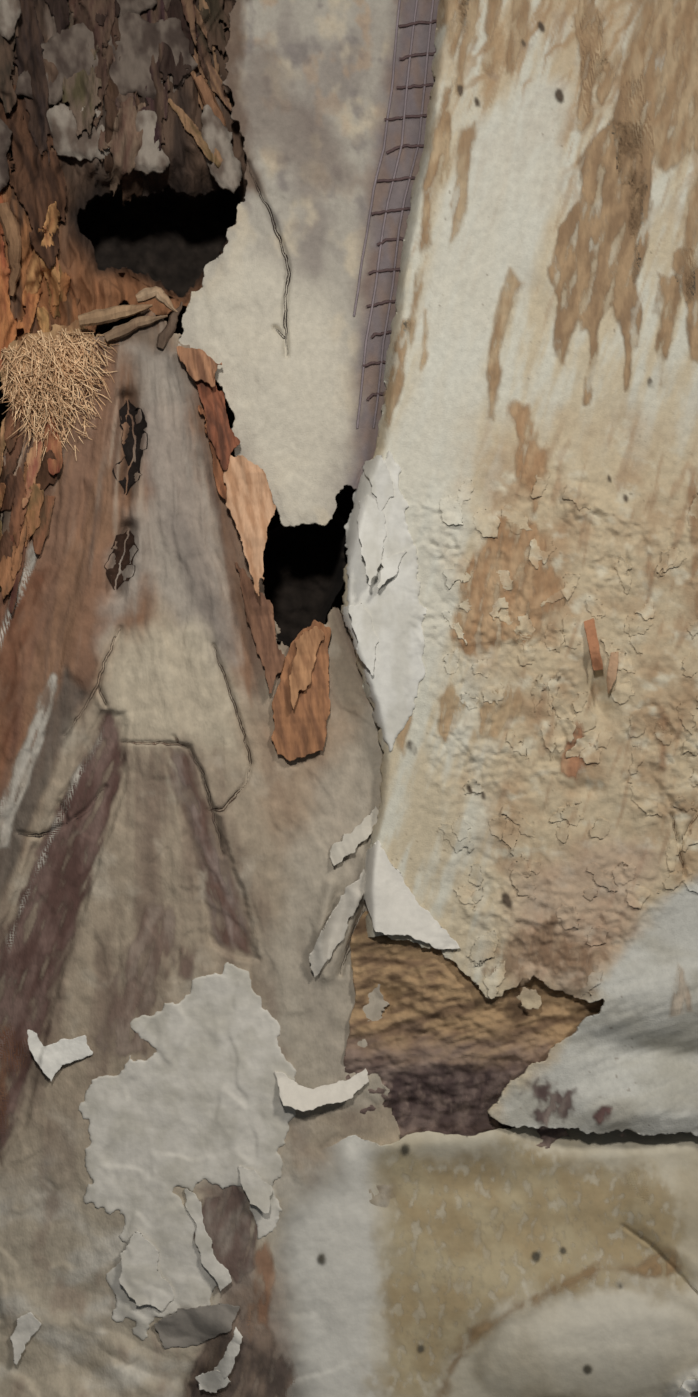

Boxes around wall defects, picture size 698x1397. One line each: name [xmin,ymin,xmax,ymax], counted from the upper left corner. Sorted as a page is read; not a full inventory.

peeling [15,0,198,176]
water stain [421,0,544,249]
water stain [555,0,615,132]
crack [249,166,291,356]
water stain [384,281,427,423]
water stain [487,269,520,416]
water stain [656,248,698,361]
peeling [342,451,504,752]
peeling [0,674,57,848]
crack [127,650,252,854]
peeling [0,713,126,1149]
peeling [79,752,611,1397]